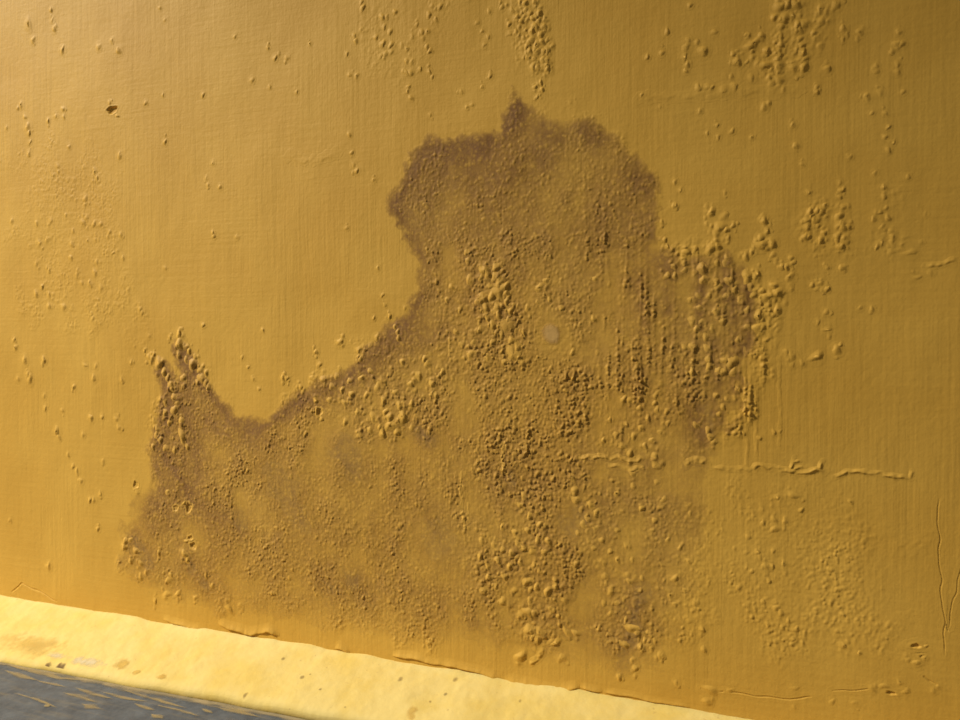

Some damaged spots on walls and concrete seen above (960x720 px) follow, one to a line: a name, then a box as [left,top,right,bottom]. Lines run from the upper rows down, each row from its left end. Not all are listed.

water stain [390,100,525,237]
water stain [179,349,312,435]
crack [931,494,960,660]